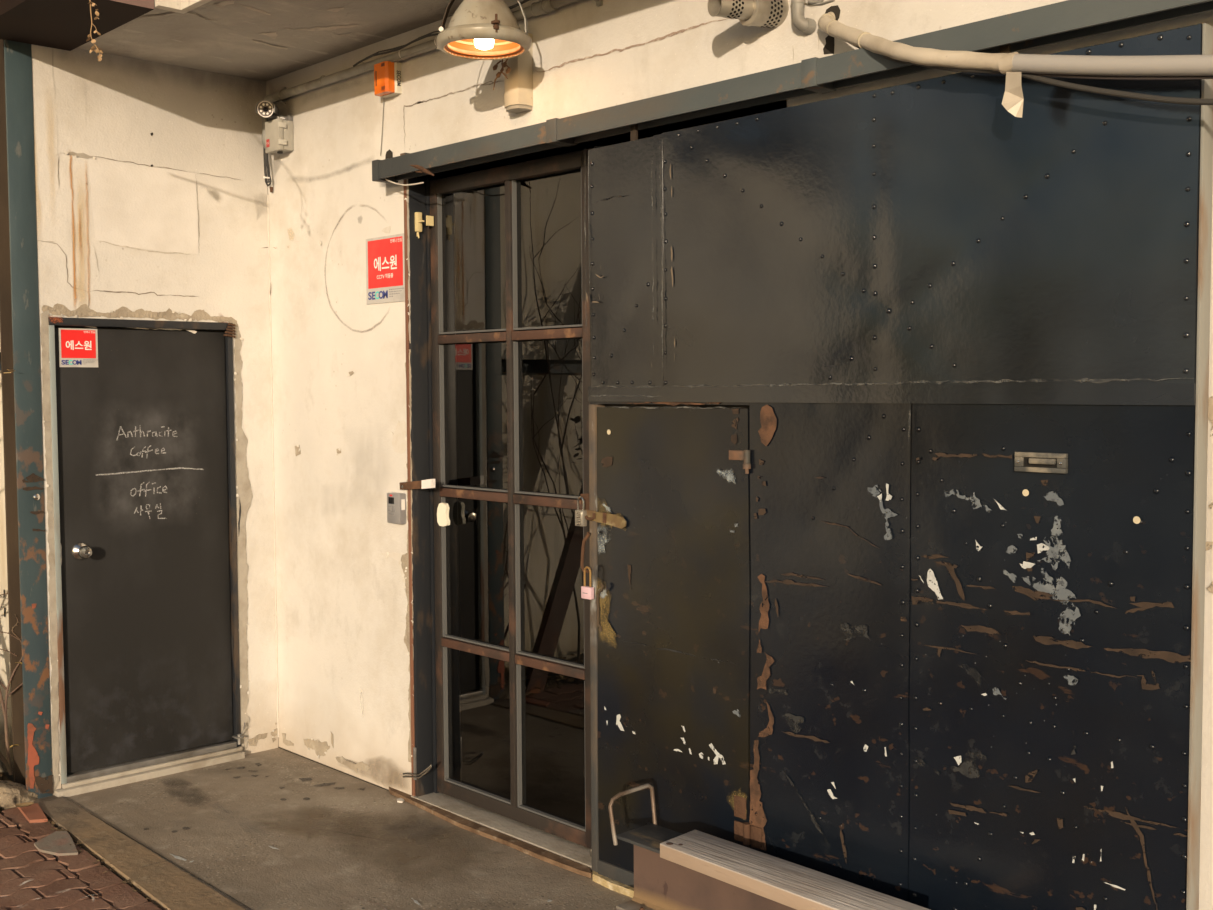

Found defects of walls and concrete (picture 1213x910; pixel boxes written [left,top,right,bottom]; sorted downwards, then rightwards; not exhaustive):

rust [758,405,777,465]
spalling [22,303,371,794]
rust [596,586,614,641]
rust [900,561,987,622]
rust [1003,586,1053,615]
rust [1125,597,1174,614]
rust [961,625,1007,635]
rust [1033,636,1191,663]
rust [741,574,804,851]
rust [915,752,987,778]
rust [948,803,1007,816]
rust [1084,806,1180,829]